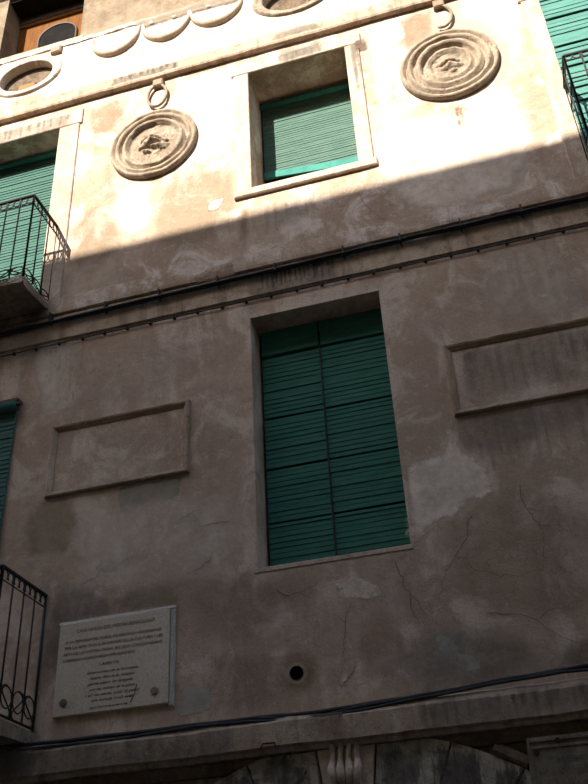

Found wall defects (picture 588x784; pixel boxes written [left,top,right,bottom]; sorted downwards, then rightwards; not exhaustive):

peeling [117,183,152,234]
crack [395,487,573,623]